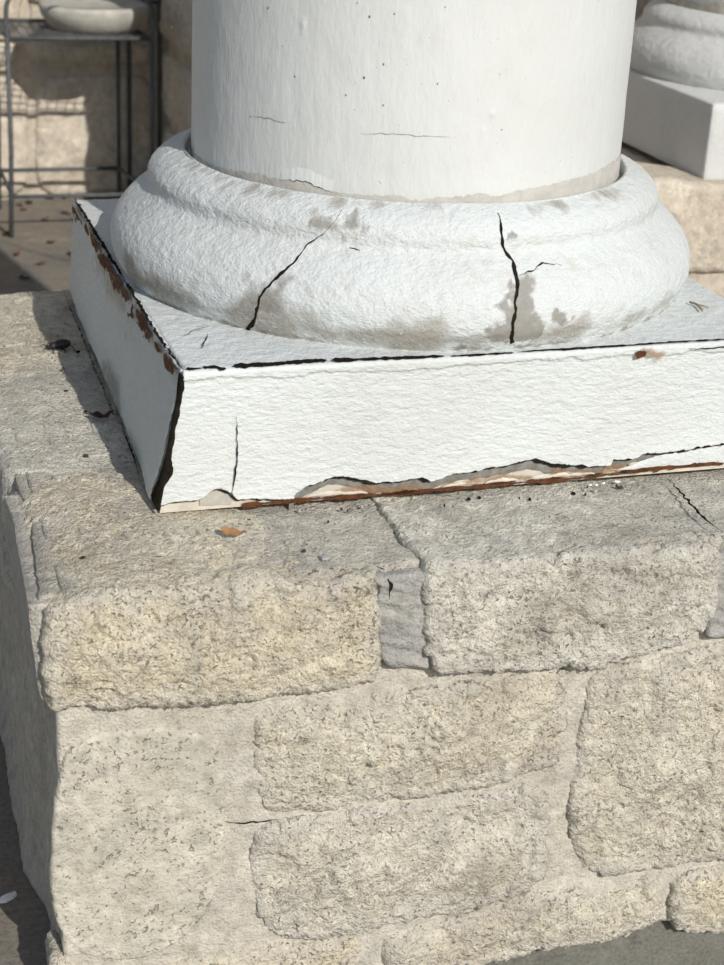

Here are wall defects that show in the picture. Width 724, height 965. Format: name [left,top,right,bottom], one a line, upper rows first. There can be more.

corrosion [72,206,174,375]
crack [64,199,724,511]
corrosion [242,461,724,508]
flaking render [289,445,724,510]
crack [668,479,717,528]